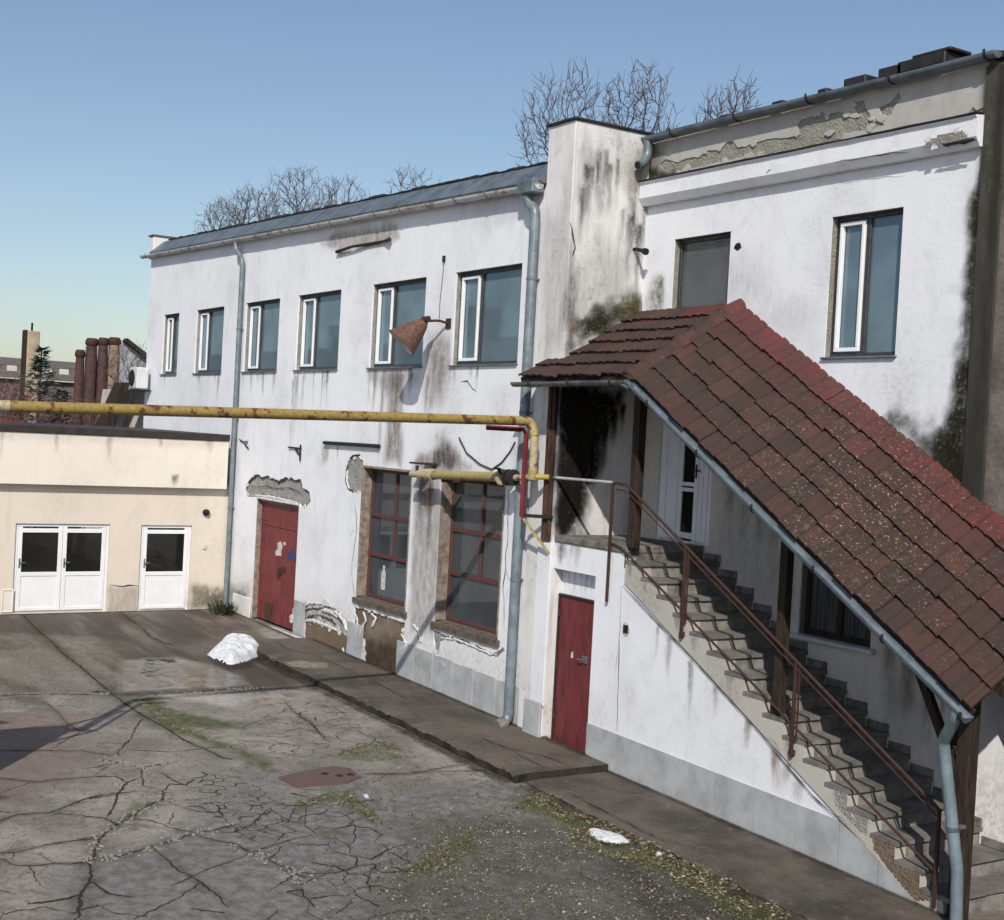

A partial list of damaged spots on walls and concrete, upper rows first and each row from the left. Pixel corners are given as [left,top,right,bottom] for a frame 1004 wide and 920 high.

peeling [660,93,901,171]
spalling [924,127,975,151]
water stain [374,373,402,457]
spalling [246,474,310,508]
spalling [345,454,365,493]
water stain [555,386,626,535]
water stain [922,428,961,480]
spalling [289,598,421,673]
spalling [432,631,505,667]
crack [260,698,395,757]
crack [185,772,426,920]
crack [0,905,148,918]